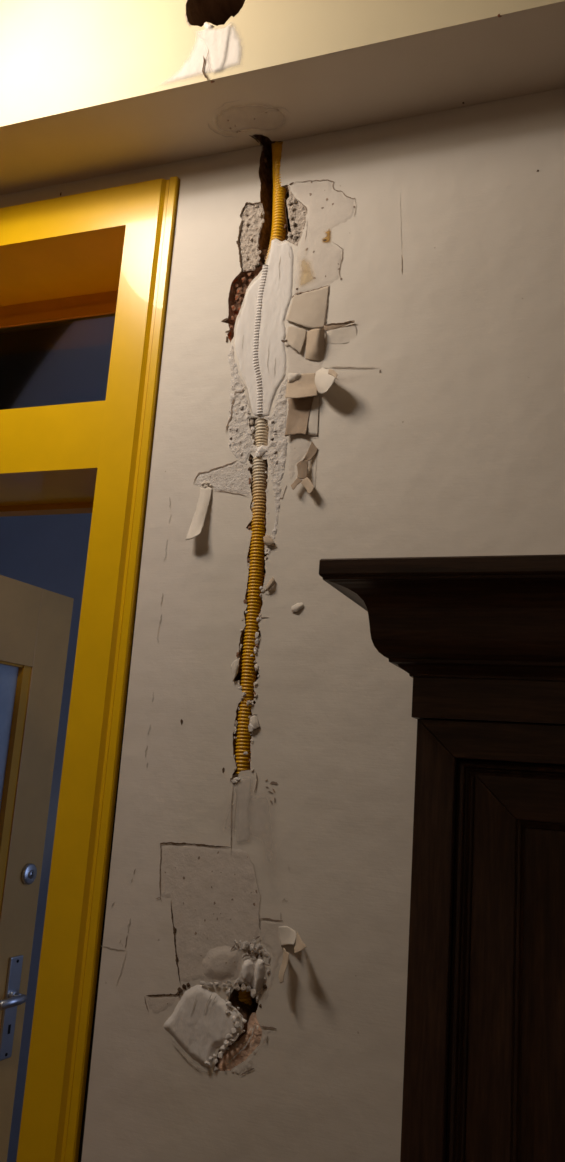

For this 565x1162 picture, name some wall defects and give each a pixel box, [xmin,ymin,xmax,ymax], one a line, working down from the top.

peeling [286,179,356,296]
flaking render [185,202,381,773]
peeling [145,982,191,1014]
spalling [171,918,307,1076]